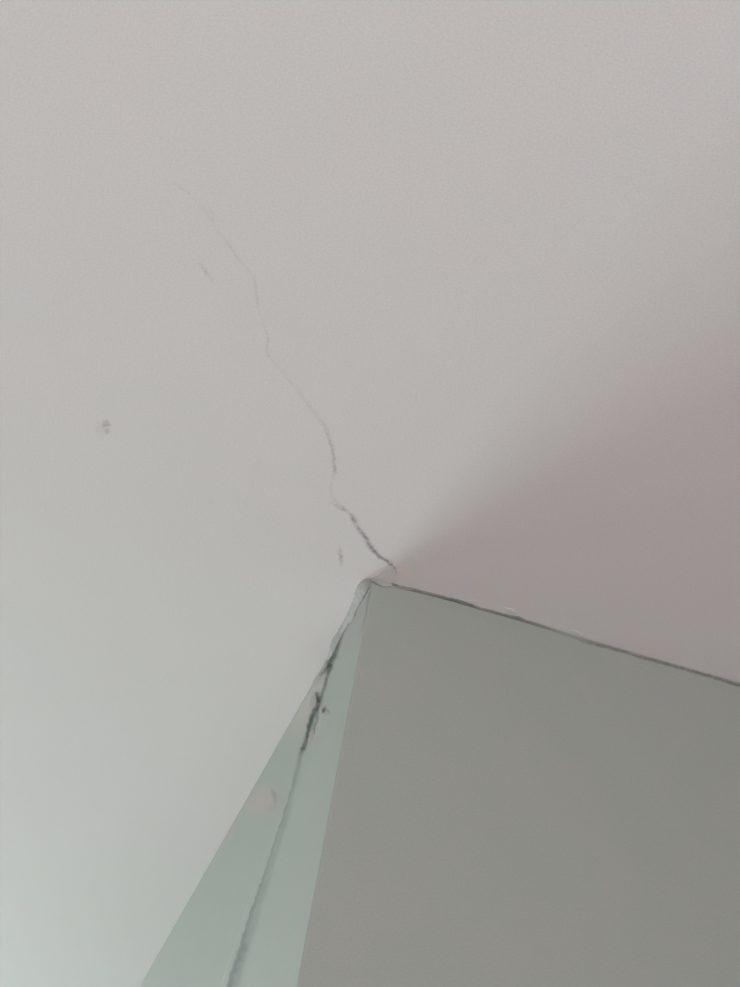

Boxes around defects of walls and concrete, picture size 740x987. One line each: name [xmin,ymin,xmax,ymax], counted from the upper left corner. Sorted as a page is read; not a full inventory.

crack [221,696,319,987]